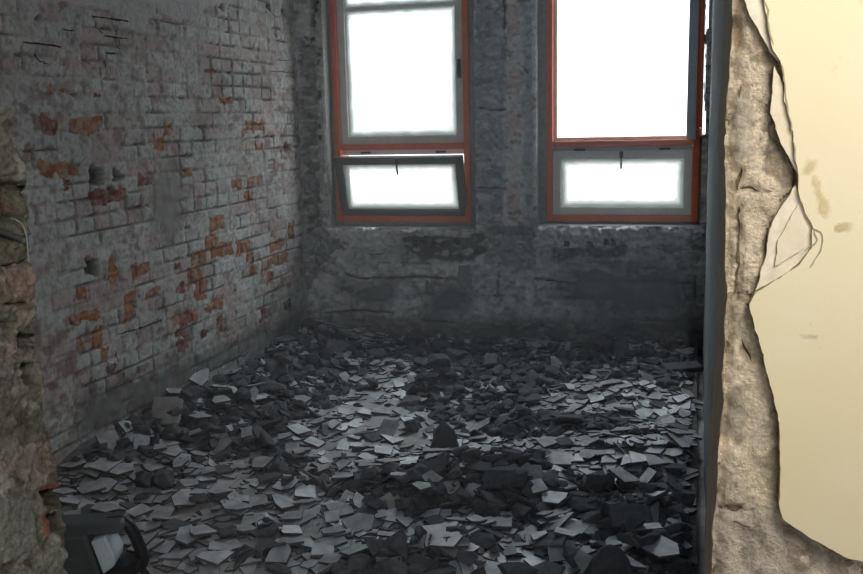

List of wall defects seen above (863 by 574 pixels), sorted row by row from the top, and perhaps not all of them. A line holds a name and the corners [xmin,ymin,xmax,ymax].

spalling [40,112,103,136]
spalling [241,118,264,152]
spalling [37,159,79,191]
spalling [84,186,128,206]
spalling [231,176,260,201]
flaking render [0,262,38,305]
spalling [121,261,160,326]
spalling [172,214,295,352]
spalling [712,0,863,574]
spalling [68,286,117,375]